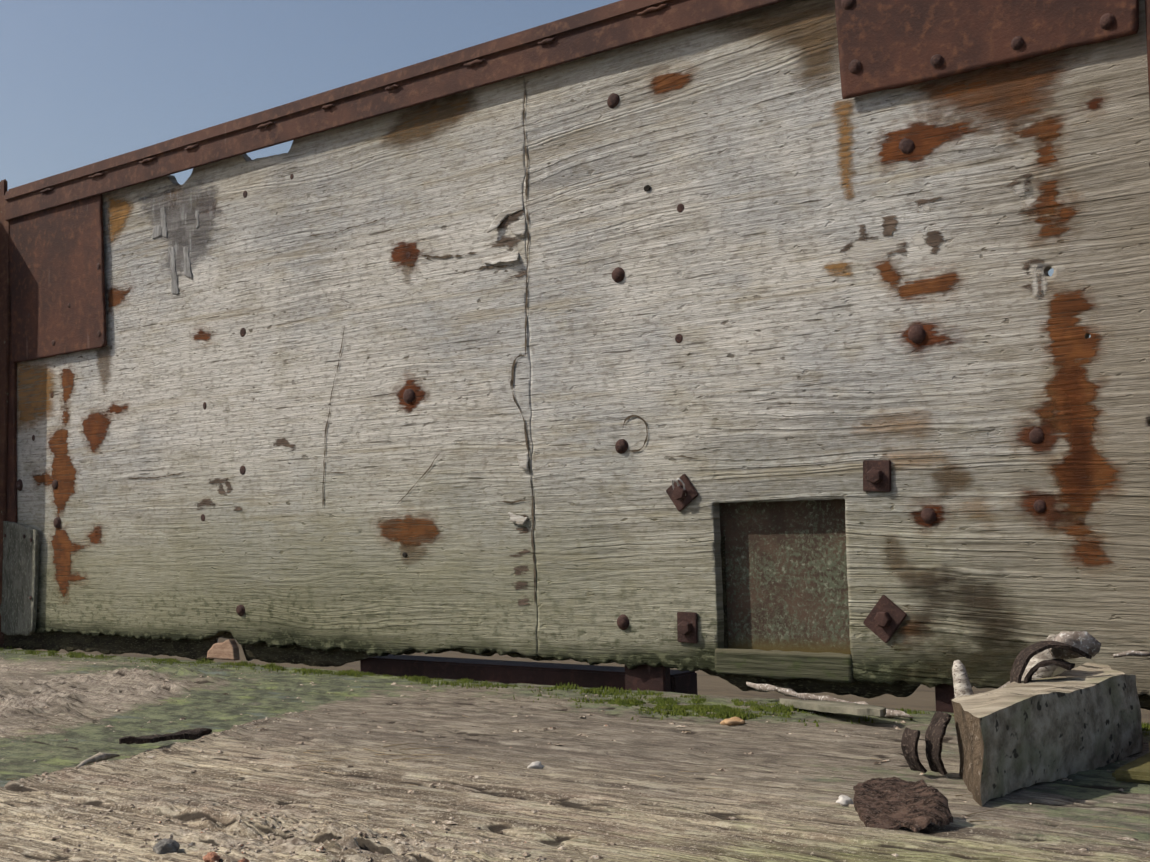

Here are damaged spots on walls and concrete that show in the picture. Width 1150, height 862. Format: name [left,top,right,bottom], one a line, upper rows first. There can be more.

corrosion [649,70,692,94]
corrosion [878,54,1068,167]
corrosion [1032,180,1078,238]
corrosion [390,242,420,268]
corrosion [875,260,959,300]
crack [421,82,547,605]
corrosion [82,402,128,452]
crack [314,327,345,504]
corrosion [396,379,426,413]
corrosion [1016,290,1120,566]
corrosion [33,369,102,597]
corrosion [378,515,440,547]